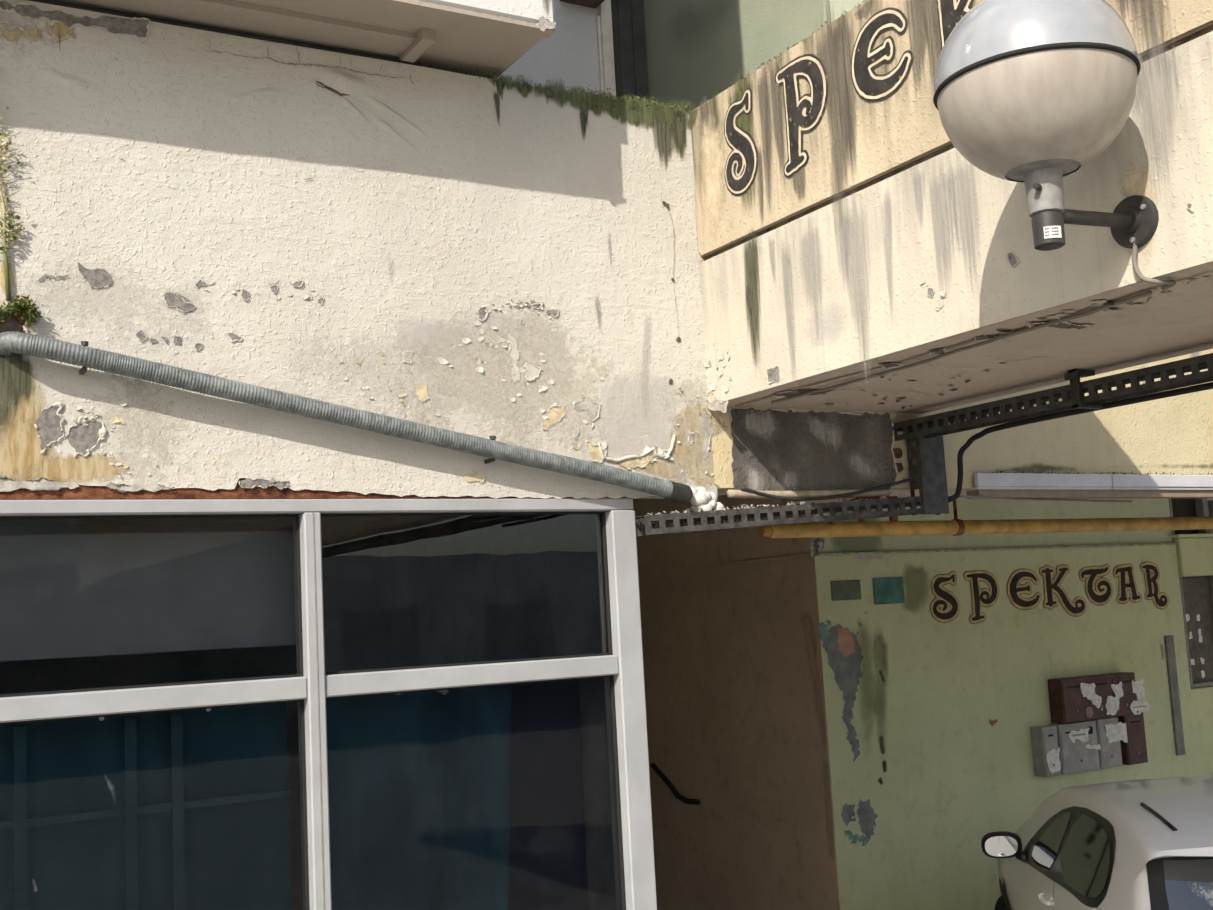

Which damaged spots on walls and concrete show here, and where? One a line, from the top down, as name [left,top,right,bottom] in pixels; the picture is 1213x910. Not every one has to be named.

spalling [0,0,152,42]
damp [906,0,941,78]
damp [494,79,504,121]
damp [580,98,709,166]
damp [729,63,805,215]
damp [817,1,872,206]
peeling [77,262,113,288]
damp [0,353,31,427]
peeling [34,398,175,493]
peeling [523,343,917,495]
spalling [0,476,79,492]
spalling [239,477,289,490]